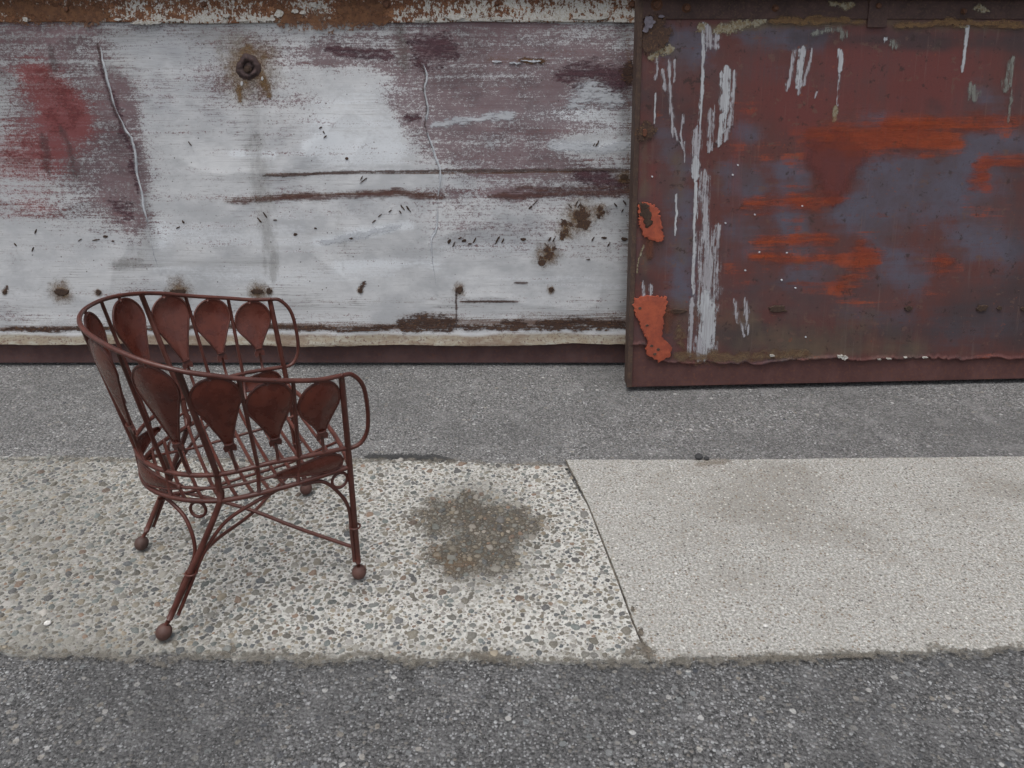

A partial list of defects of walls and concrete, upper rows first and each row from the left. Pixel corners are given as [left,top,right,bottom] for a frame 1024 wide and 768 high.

corrosion [0,0,110,28]
corrosion [274,0,391,34]
peeling [696,19,767,49]
corrosion [224,38,276,102]
corrosion [487,174,629,268]
peeling [571,165,664,259]
peeling [632,295,687,363]
water stain [411,490,548,582]